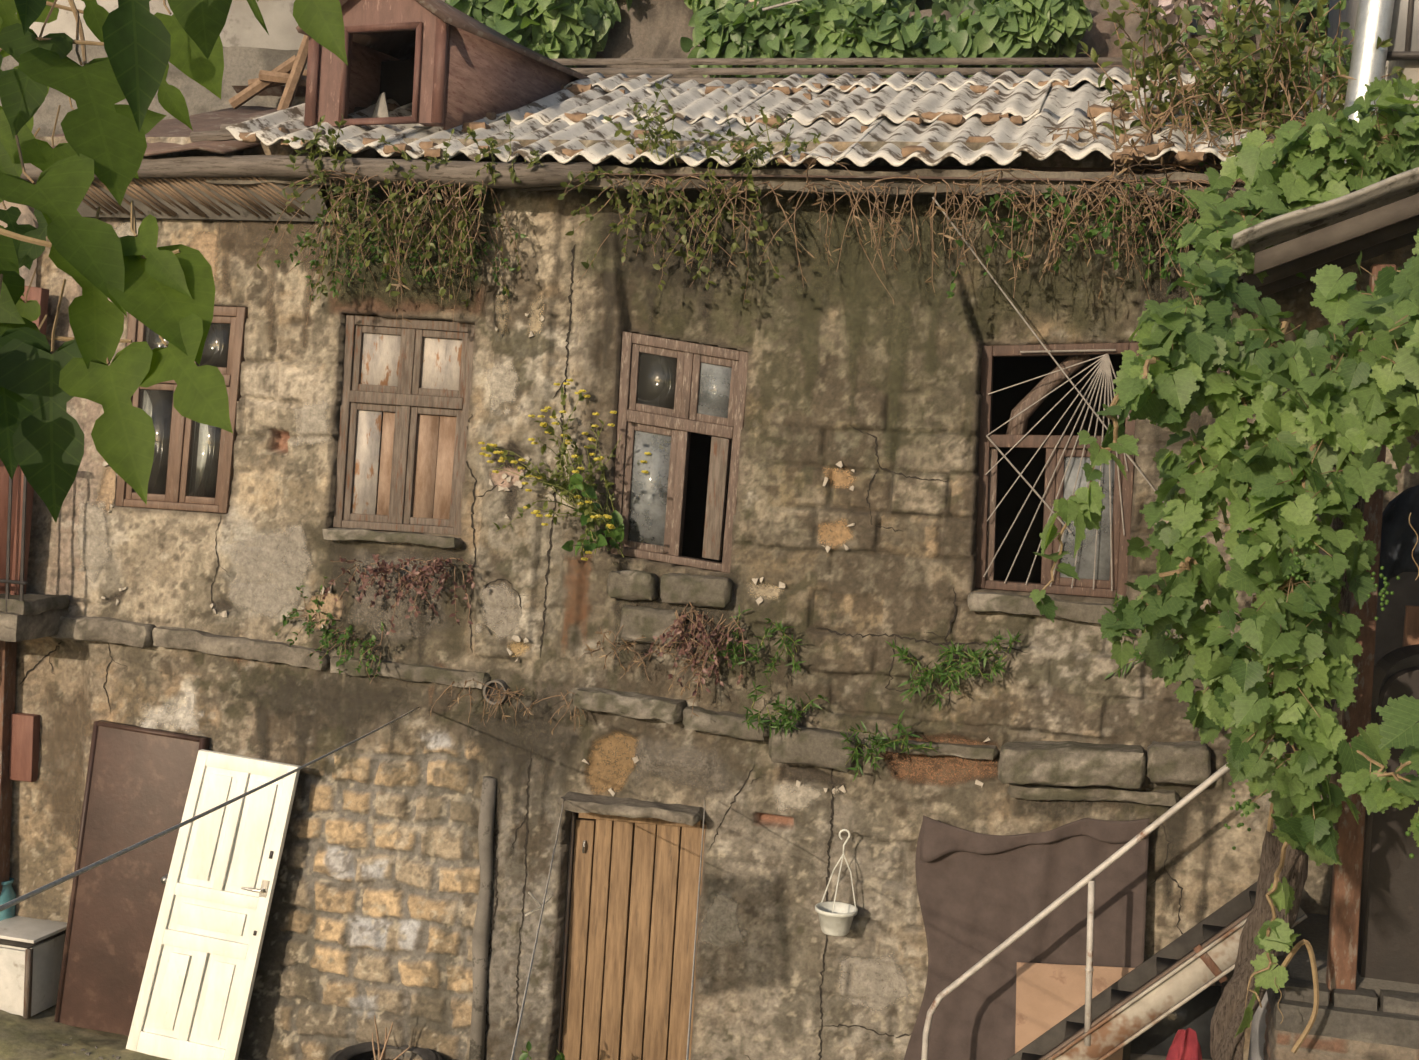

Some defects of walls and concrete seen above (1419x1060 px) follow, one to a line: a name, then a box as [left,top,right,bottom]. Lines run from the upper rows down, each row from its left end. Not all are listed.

crack [466,244,576,657]
water stain [470,696,550,841]
spalling [582,732,639,797]
crack [710,765,765,848]
crack [818,769,912,1060]